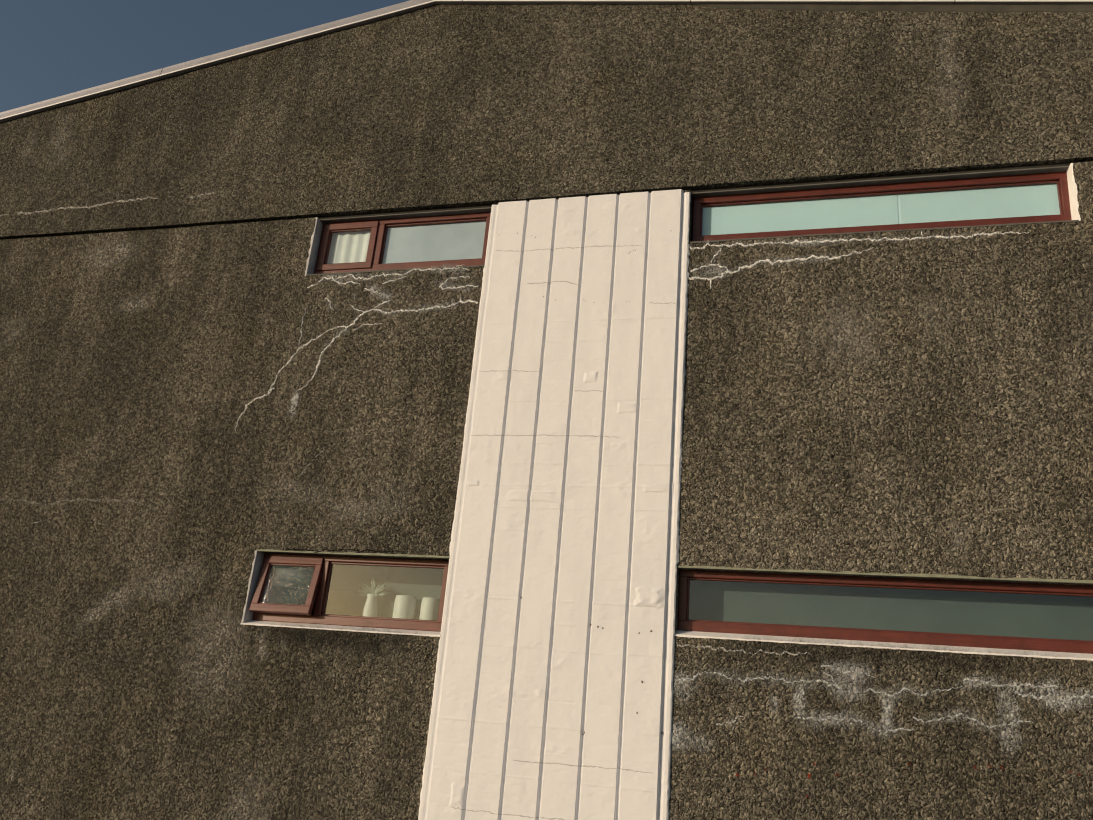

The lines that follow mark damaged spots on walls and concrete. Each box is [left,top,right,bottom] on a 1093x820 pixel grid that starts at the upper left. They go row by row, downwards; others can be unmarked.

crack [689,231,1029,288]
crack [235,265,478,431]
crack [677,644,1093,736]